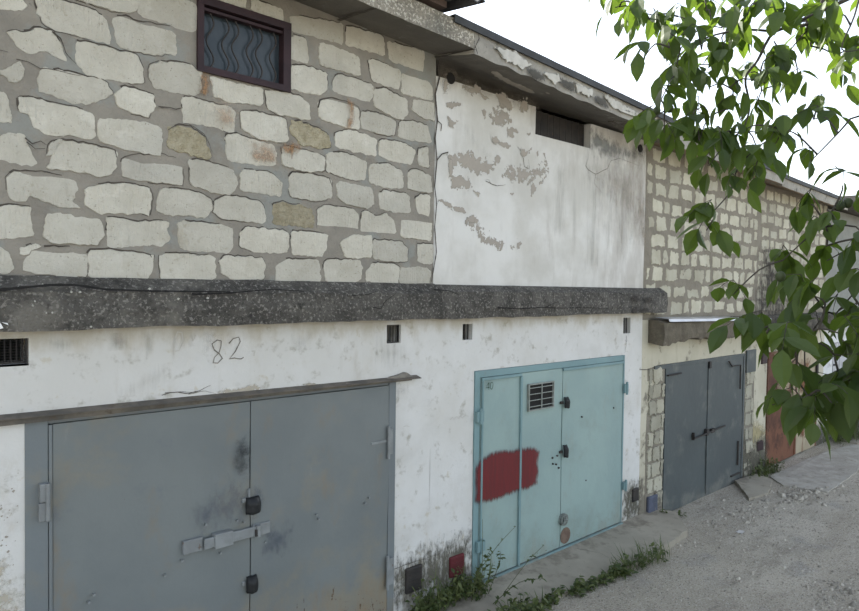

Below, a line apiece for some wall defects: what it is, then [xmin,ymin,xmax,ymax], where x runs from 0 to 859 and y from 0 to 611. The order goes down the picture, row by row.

peeling [494,47,532,70]
peeling [544,72,561,94]
peeling [574,82,638,131]
peeling [446,71,549,197]
peeling [438,199,522,251]
crack [163,385,212,395]
water stain [394,532,472,609]